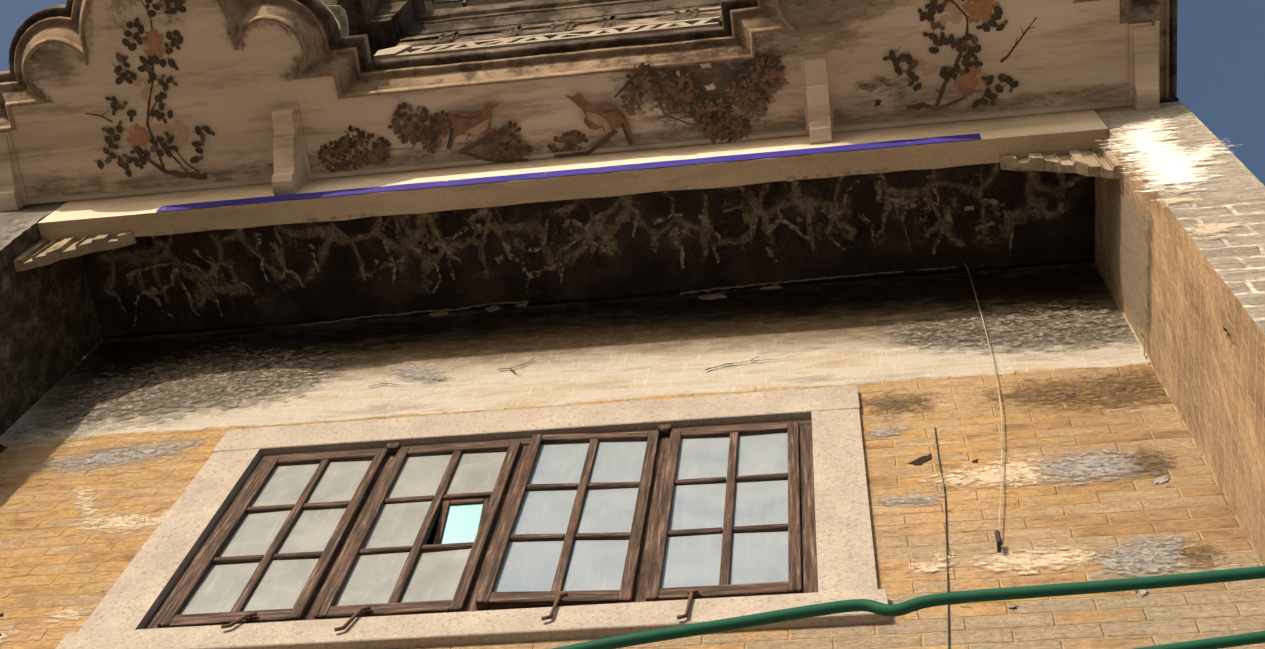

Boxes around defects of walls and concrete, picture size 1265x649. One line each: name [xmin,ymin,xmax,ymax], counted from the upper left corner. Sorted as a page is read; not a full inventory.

mould [870,299,1137,353]
damp [6,335,372,475]
damp [859,391,944,439]
damp [969,366,1168,415]
damp [1020,445,1177,485]
damp [1078,531,1225,597]